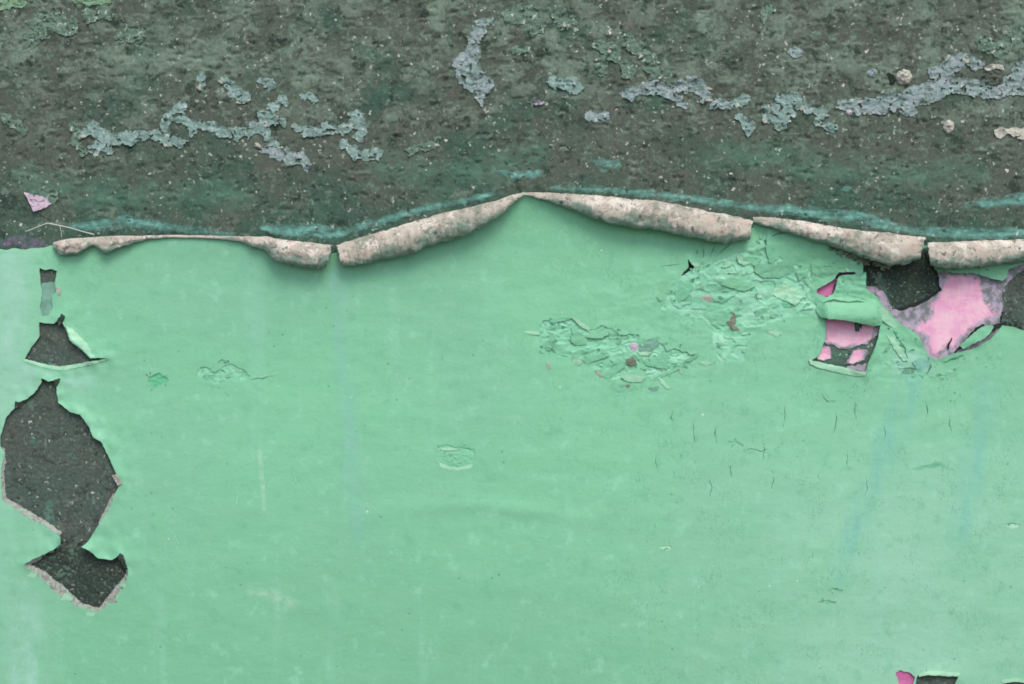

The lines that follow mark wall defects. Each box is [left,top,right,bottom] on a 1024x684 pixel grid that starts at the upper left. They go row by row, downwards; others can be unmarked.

peeling [523,228,1024,393]
peeling [1,268,128,616]
peeling [896,670,960,684]